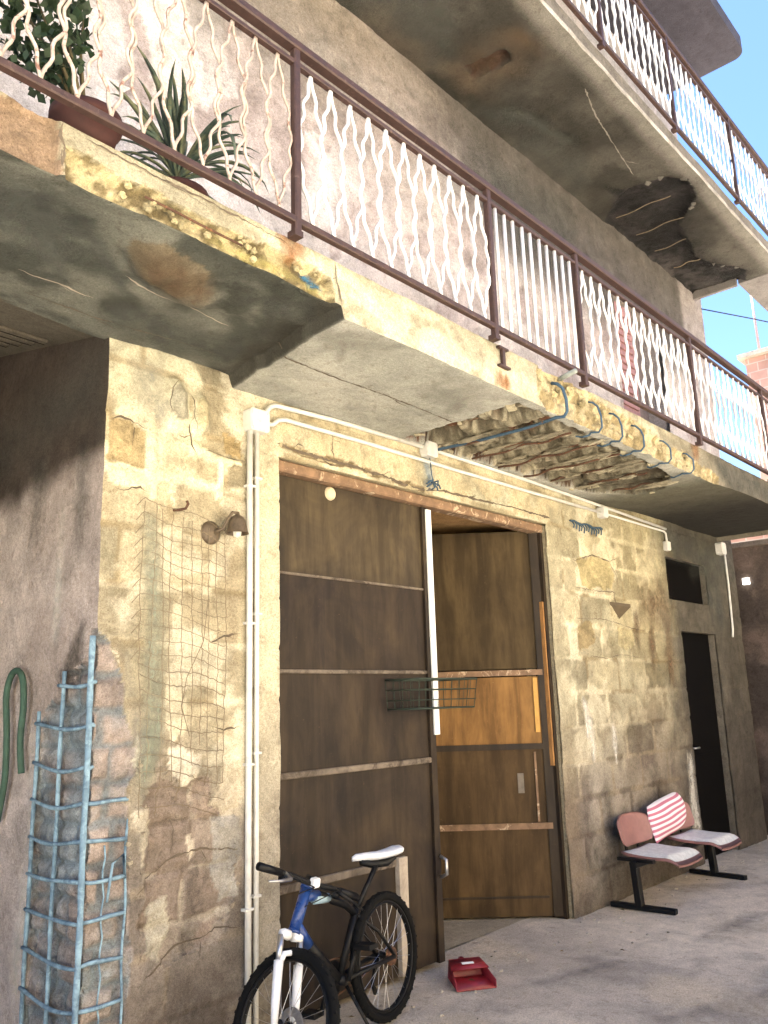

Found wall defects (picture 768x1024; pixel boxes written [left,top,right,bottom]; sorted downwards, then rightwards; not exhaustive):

crack [585,89,638,174]
crack [164,381,239,461]
crack [278,342,451,422]
spalling [536,368,719,485]
flaking render [22,628,235,1024]
crack [138,812,237,894]
crack [144,926,240,980]